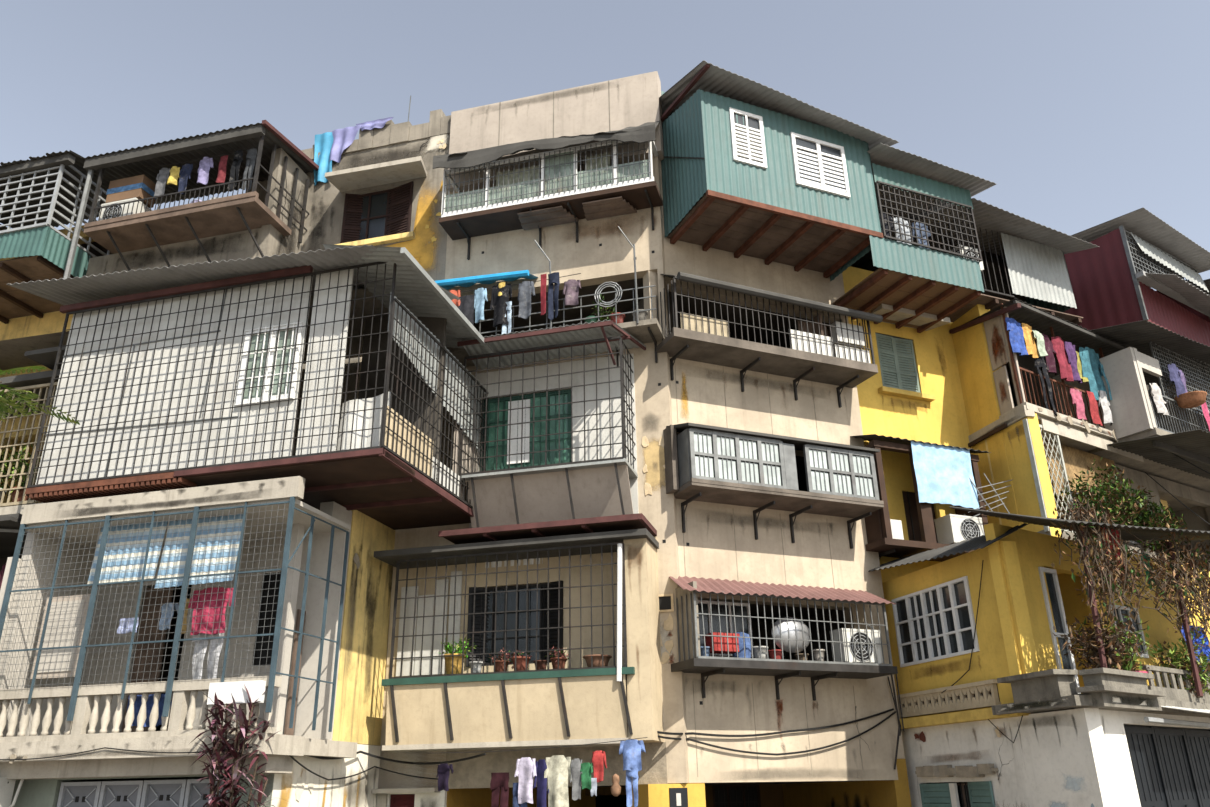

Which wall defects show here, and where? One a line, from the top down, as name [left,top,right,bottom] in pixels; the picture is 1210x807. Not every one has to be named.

peeling [384,182,443,269]
flaking render [642,417,666,496]
damp [350,566,393,635]
damp [346,778,375,804]